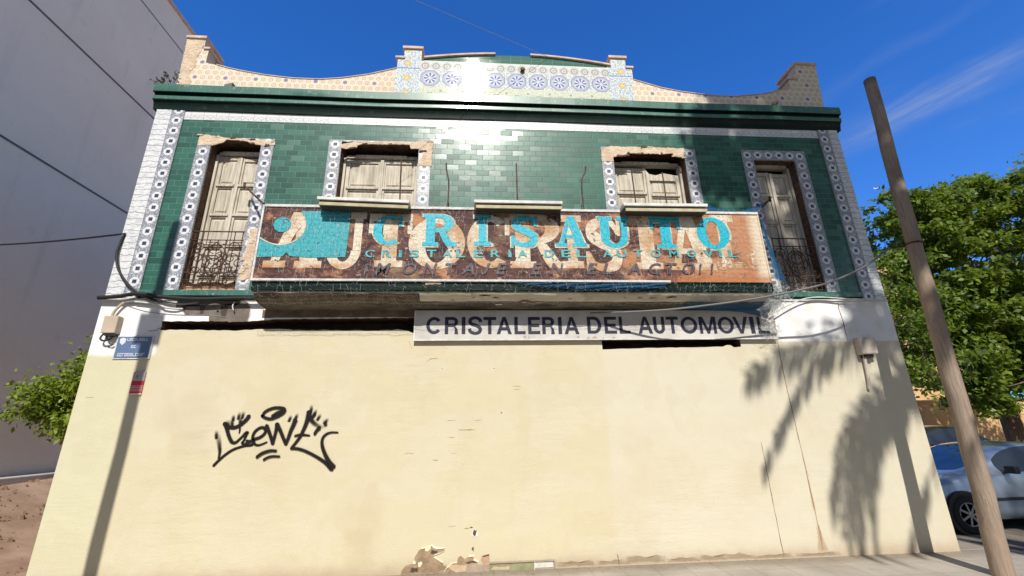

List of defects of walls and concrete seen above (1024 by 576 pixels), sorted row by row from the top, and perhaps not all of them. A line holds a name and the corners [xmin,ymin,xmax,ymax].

spalling [197,134,276,147]
spalling [339,140,434,167]
spalling [601,146,686,162]
crack [771,307,823,548]
flaking render [400,527,510,575]